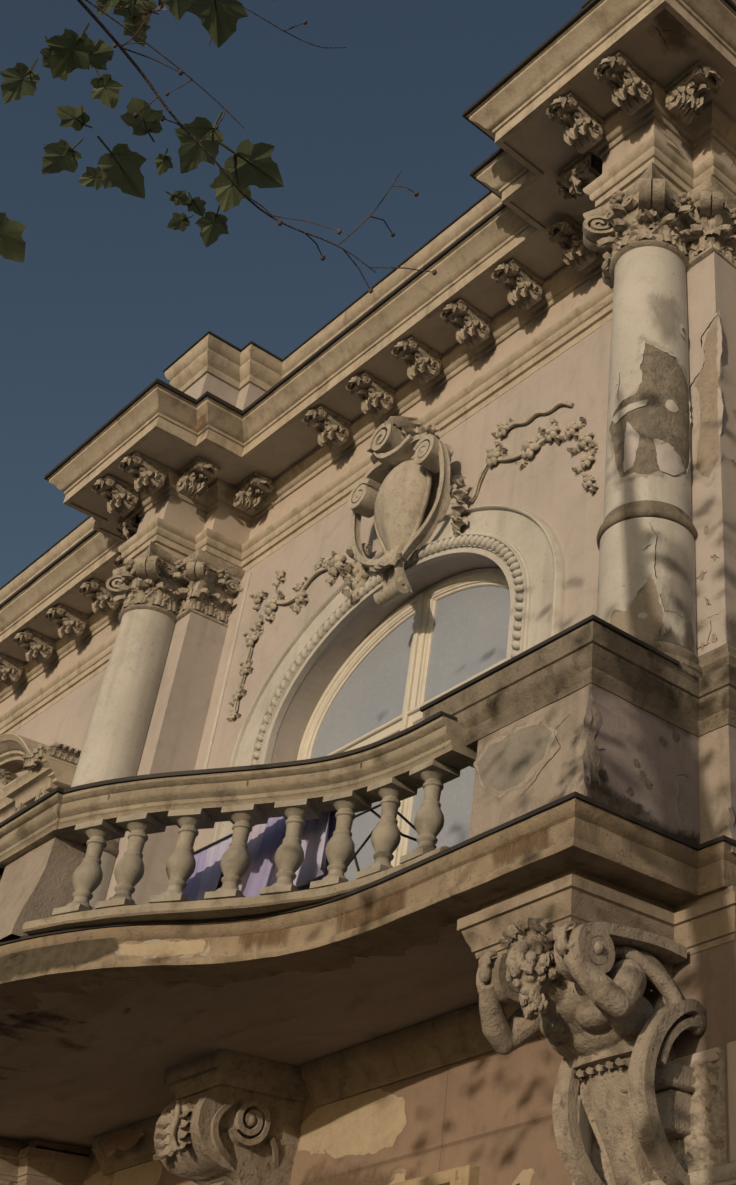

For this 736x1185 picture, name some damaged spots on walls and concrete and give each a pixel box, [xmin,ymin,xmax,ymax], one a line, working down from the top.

peeling [608,312,736,485]
peeling [607,574,670,641]
damp [586,769,699,845]